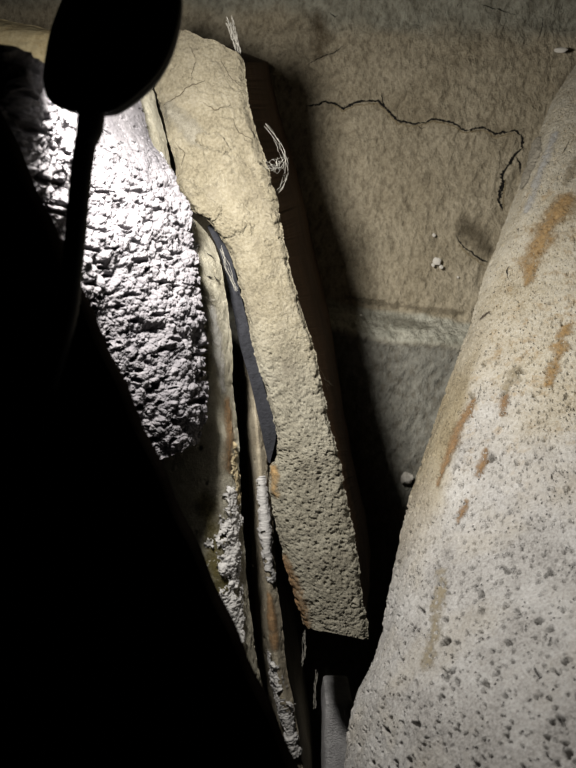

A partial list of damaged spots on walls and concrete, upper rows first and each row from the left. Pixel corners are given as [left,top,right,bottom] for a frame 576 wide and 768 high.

crack [308,91,525,211]
corrosion [520,159,576,285]
corrosion [436,398,475,486]
damp [196,492,230,595]